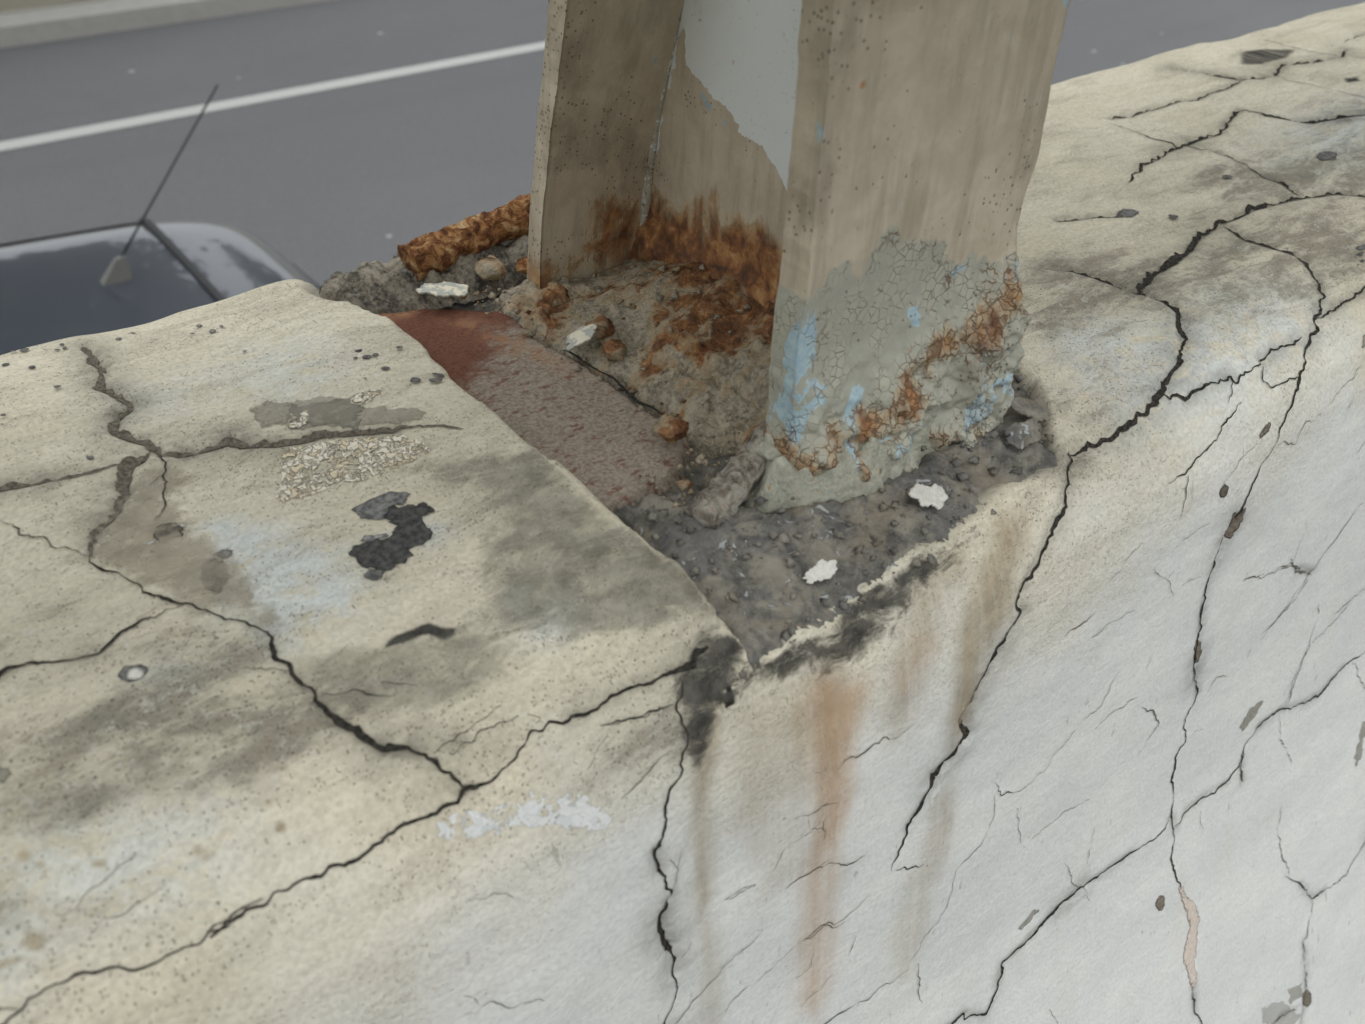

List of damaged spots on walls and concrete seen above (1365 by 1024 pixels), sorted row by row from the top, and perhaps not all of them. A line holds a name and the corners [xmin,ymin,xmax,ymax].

peeling [286,410,309,428]
peeling [275,435,430,502]
crack [0,347,867,1024]
spalling [319,234,1057,687]
corrosion [492,259,948,529]
water stain [676,557,951,765]
crack [725,725,913,900]
crack [825,36,1365,1024]